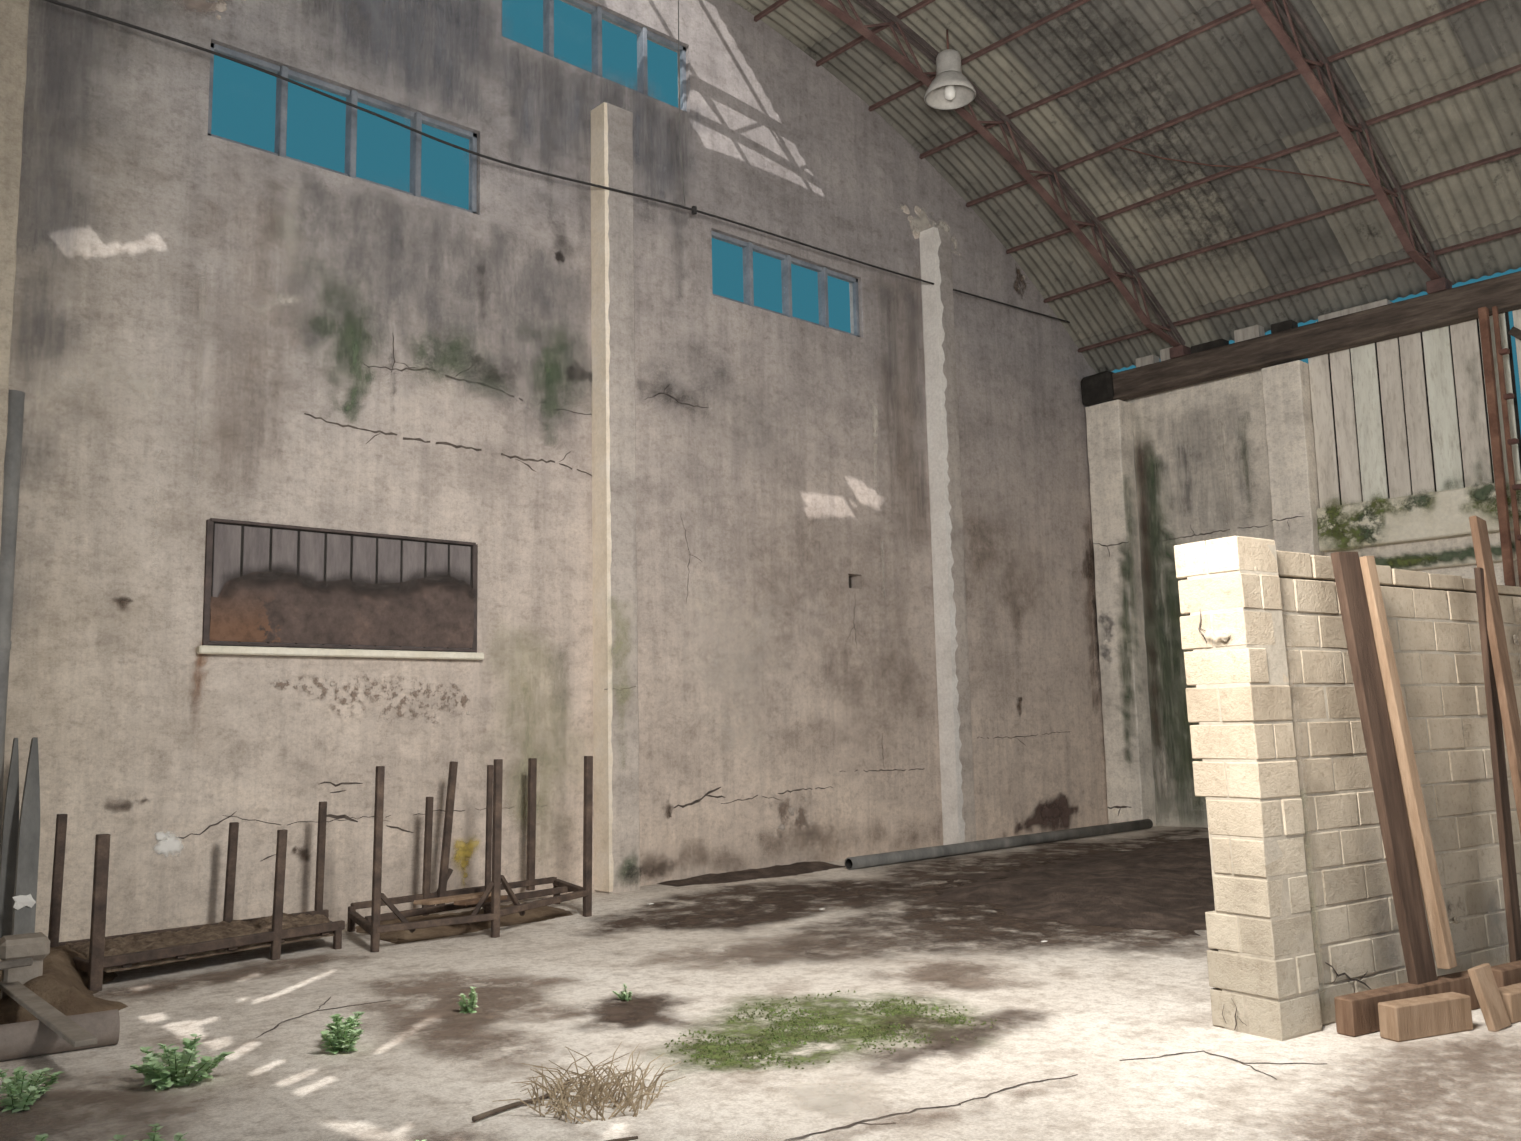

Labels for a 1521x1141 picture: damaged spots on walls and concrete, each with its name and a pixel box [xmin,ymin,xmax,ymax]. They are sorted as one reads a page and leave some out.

damp [316,319,371,420]
crack [363,333,592,415]
crack [304,413,592,476]
flaking render [276,677,471,723]
damp [597,448,1207,959]
crack [674,746,925,808]